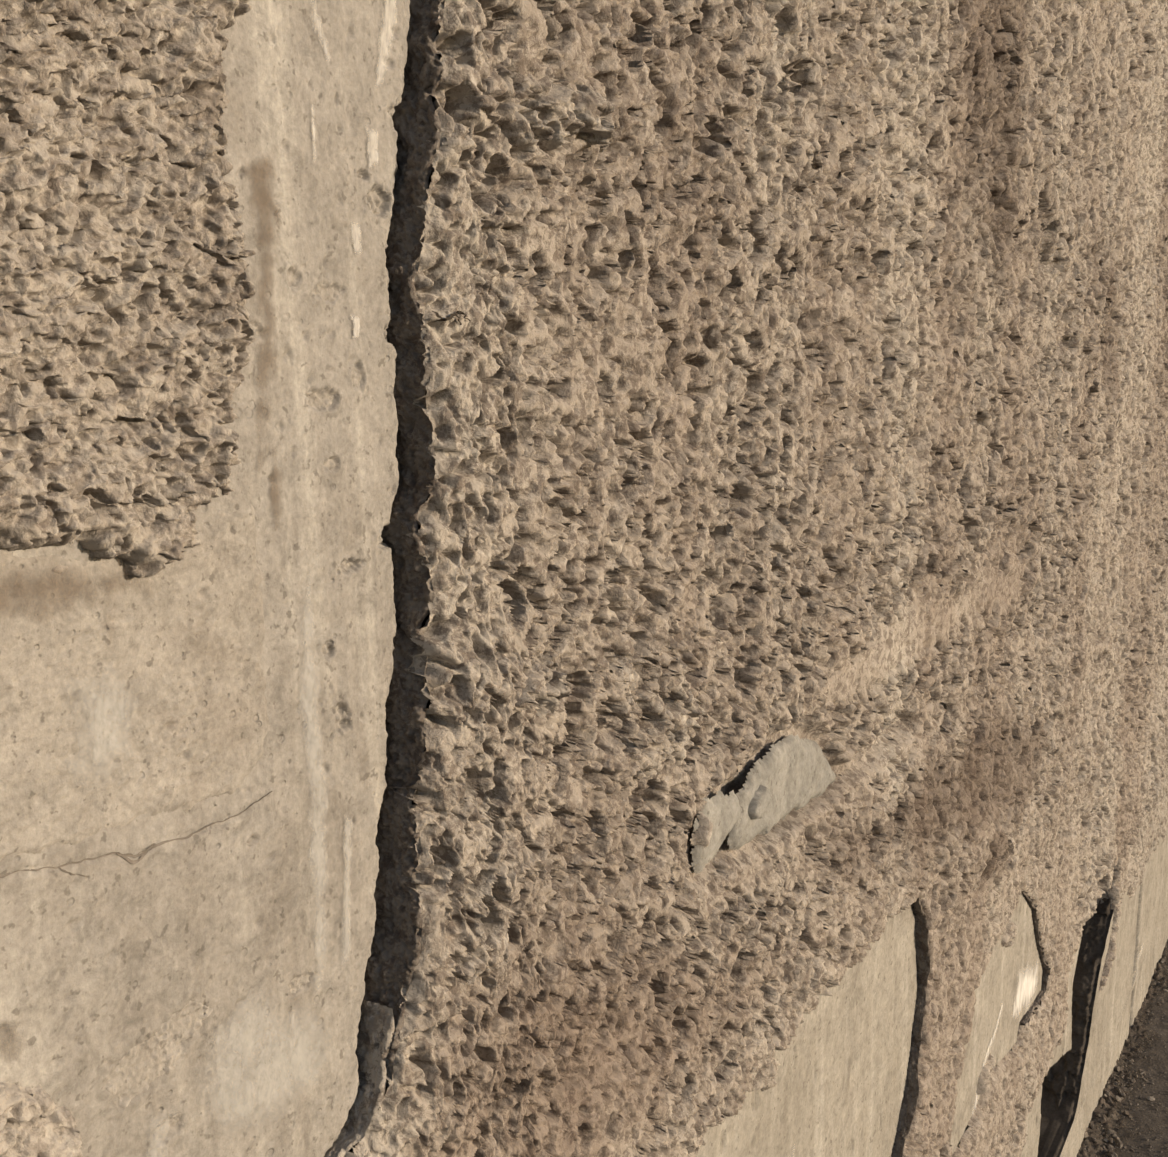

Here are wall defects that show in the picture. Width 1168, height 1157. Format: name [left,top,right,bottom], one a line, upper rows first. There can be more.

spalling [363,0,445,1087]
spalling [0,504,269,860]
crack [0,791,272,878]
spalling [690,734,835,874]
peeling [0,1082,83,1157]
spalling [107,1000,213,1108]
spalling [355,1051,366,1079]
spalling [696,889,930,1157]
spalling [949,891,1049,1157]
spalling [1049,937,1081,1068]